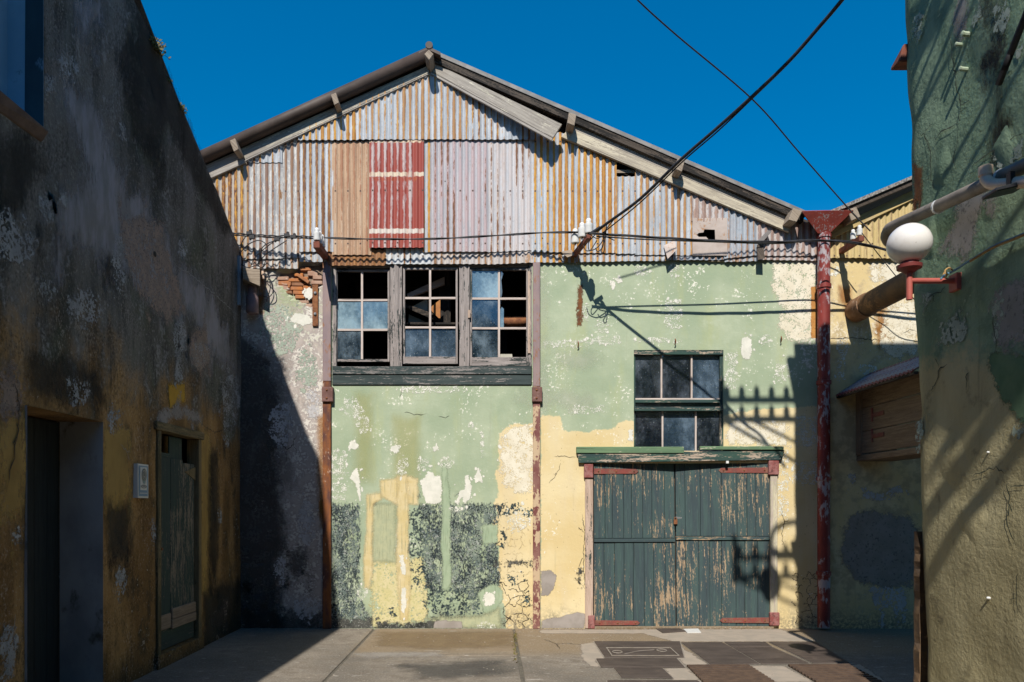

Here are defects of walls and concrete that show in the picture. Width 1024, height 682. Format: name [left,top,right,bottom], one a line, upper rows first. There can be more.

damp [0,134,40,220]
damp [0,412,26,523]
damp [29,75,512,678]
peeling [268,402,293,458]
flaking render [259,264,323,419]
peeling [290,397,376,625]
peeling [388,421,533,628]
crack [499,520,579,649]
peeling [724,260,817,390]
crack [974,466,1024,542]